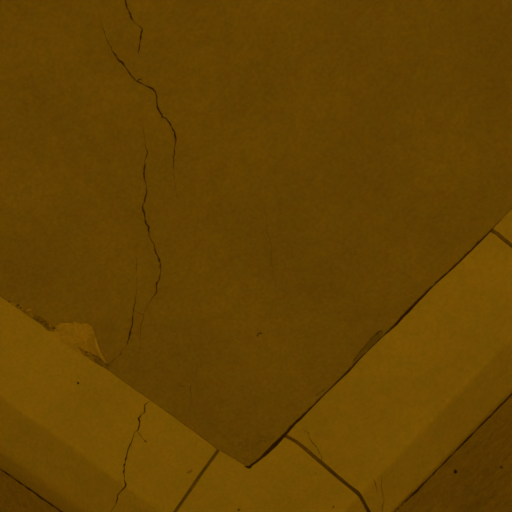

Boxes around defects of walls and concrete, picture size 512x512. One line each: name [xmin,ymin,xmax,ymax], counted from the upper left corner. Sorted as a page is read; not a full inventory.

crack [125,0,143,52]
crack [100,21,178,205]
crack [110,129,161,364]
spalling [8,301,110,370]
crack [111,401,150,511]